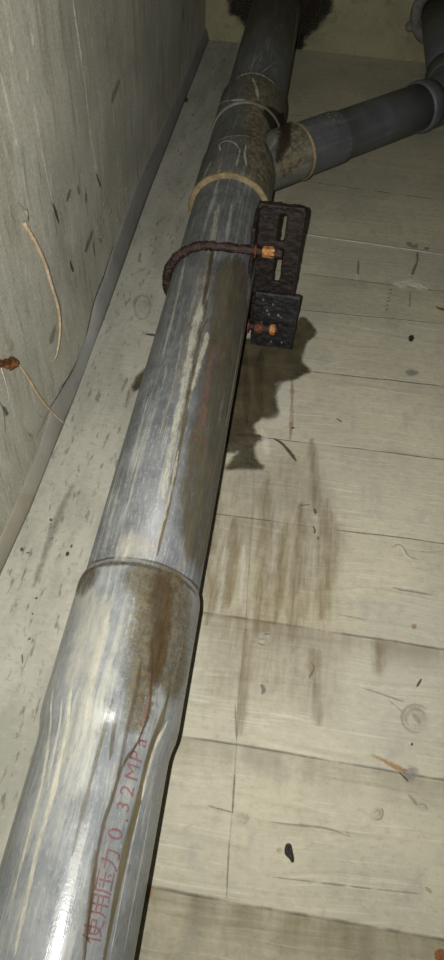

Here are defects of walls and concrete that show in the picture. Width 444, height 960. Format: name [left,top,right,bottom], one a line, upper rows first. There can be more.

damp [157,251,316,567]